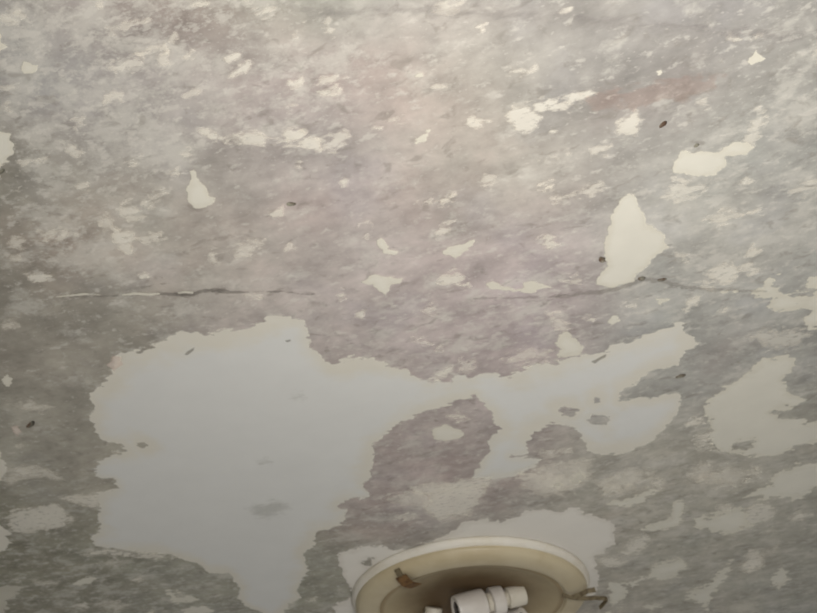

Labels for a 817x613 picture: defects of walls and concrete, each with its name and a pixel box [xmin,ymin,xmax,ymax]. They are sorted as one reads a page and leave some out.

peeling [111,32,178,71]
peeling [223,53,251,78]
peeling [748,50,765,65]
peeling [615,109,644,135]
peeling [0,132,46,174]
peeling [660,107,769,204]
peeling [186,170,215,209]
peeling [98,189,167,254]
peeling [442,240,475,258]
peeling [596,194,669,288]
crack [56,288,315,298]
peeling [0,243,817,613]